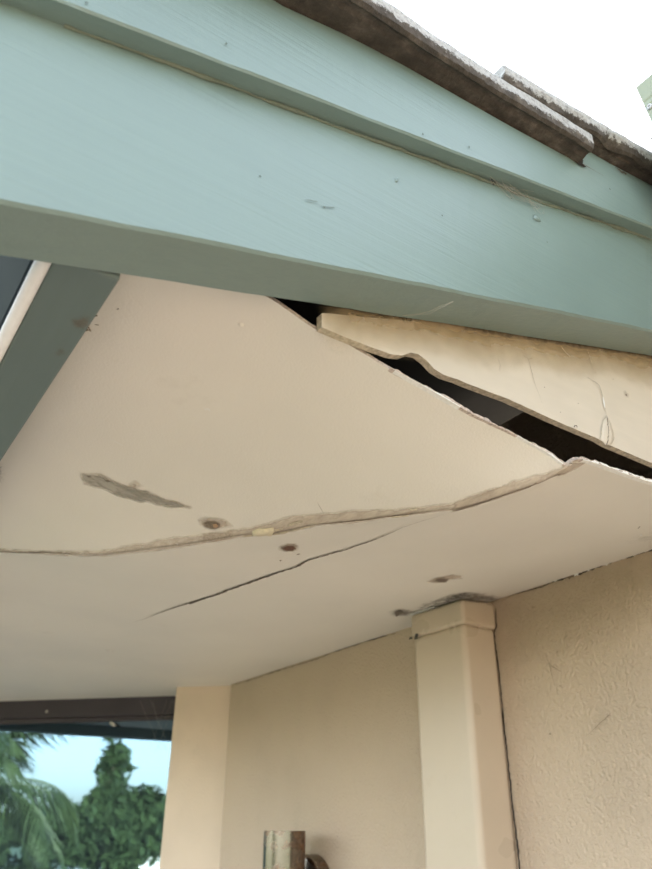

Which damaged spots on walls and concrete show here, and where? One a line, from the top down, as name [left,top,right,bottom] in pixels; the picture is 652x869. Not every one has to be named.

crack [0,533,253,555]
crack [135,473,566,622]